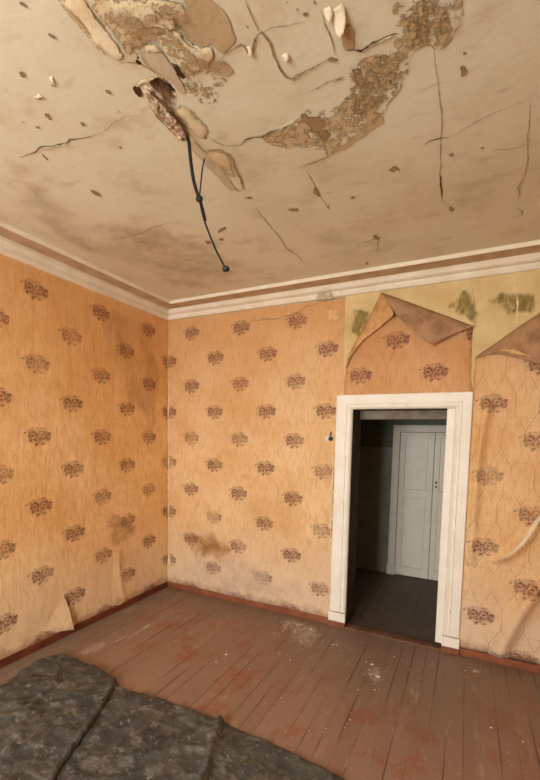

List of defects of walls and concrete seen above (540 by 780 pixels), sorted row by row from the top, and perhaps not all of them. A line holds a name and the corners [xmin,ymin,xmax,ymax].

peeling [58,0,464,199]
crack [20,115,133,160]
crack [424,54,531,215]
damp [352,311,368,335]
peeling [344,270,540,387]
damp [457,291,475,320]
damp [497,294,534,312]